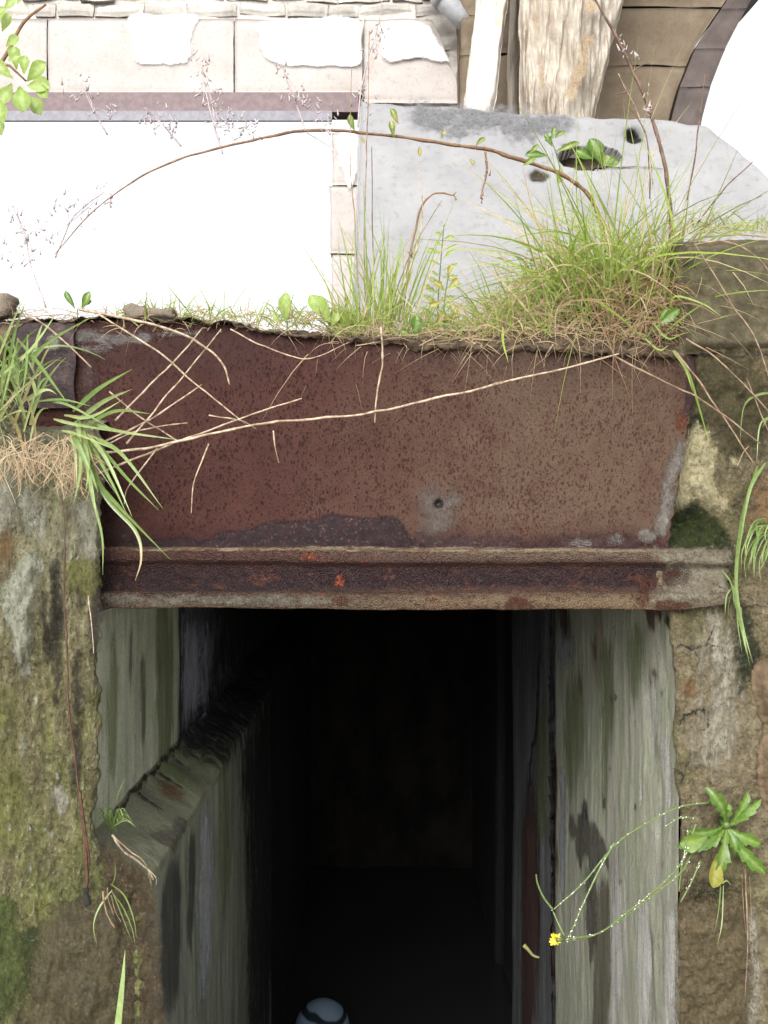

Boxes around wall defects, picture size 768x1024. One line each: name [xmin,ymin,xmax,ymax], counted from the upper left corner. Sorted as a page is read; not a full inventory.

leakage [412,101,572,139]
corrosion [76,362,106,440]
corrosion [102,357,695,561]
leakage [0,476,47,541]
leakage [73,496,97,562]
corrosion [634,570,693,611]
leakage [12,554,334,1024]